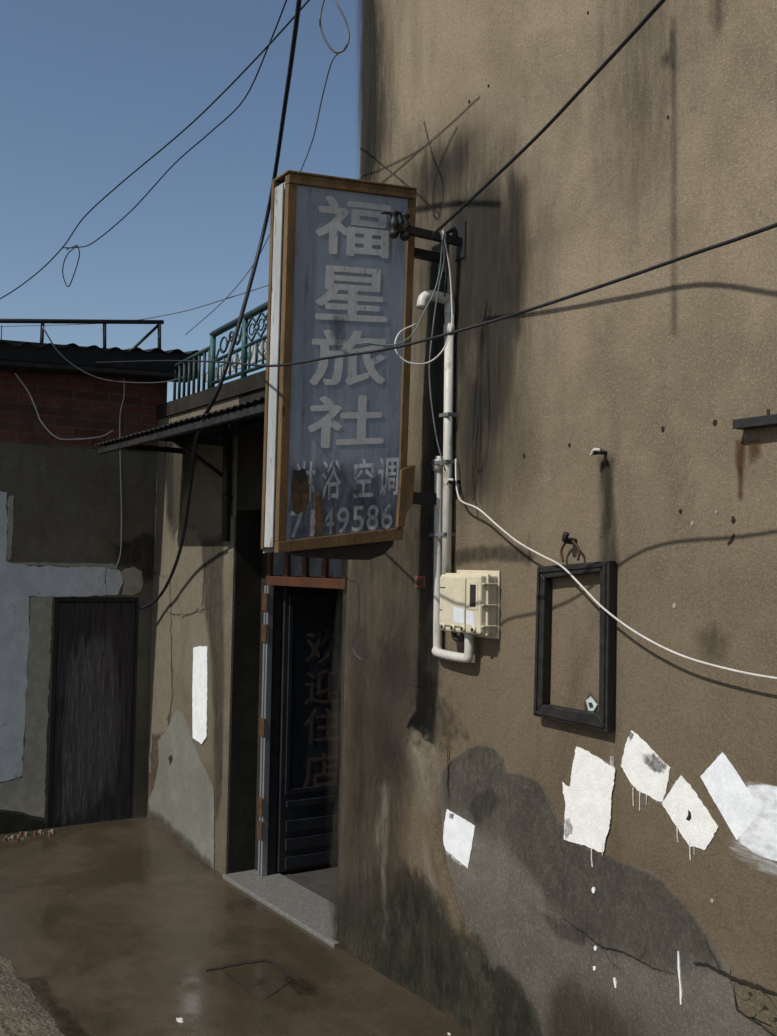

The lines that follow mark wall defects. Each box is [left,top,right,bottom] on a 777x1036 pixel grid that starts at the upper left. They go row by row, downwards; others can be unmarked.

damp [601,459,616,561]
corrosion [736,440,758,497]
damp [330,142,541,1036]
crack [563,918,777,1036]
spalling [736,985,777,1033]